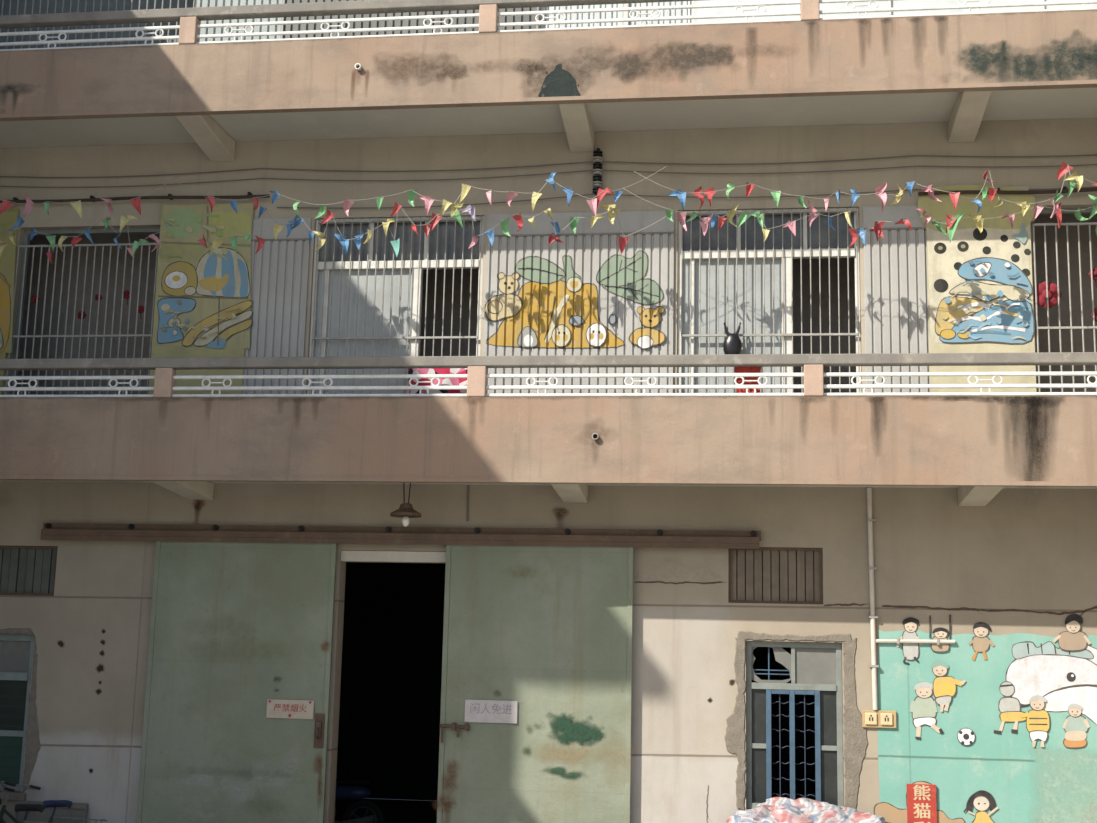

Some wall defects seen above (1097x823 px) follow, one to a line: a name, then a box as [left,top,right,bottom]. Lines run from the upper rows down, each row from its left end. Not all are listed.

leakage [593,45,732,78]
leakage [962,42,1097,81]
leakage [945,396,1047,480]
crack [824,603,1097,616]
peeling [550,714,603,745]
peeling [546,767,580,778]